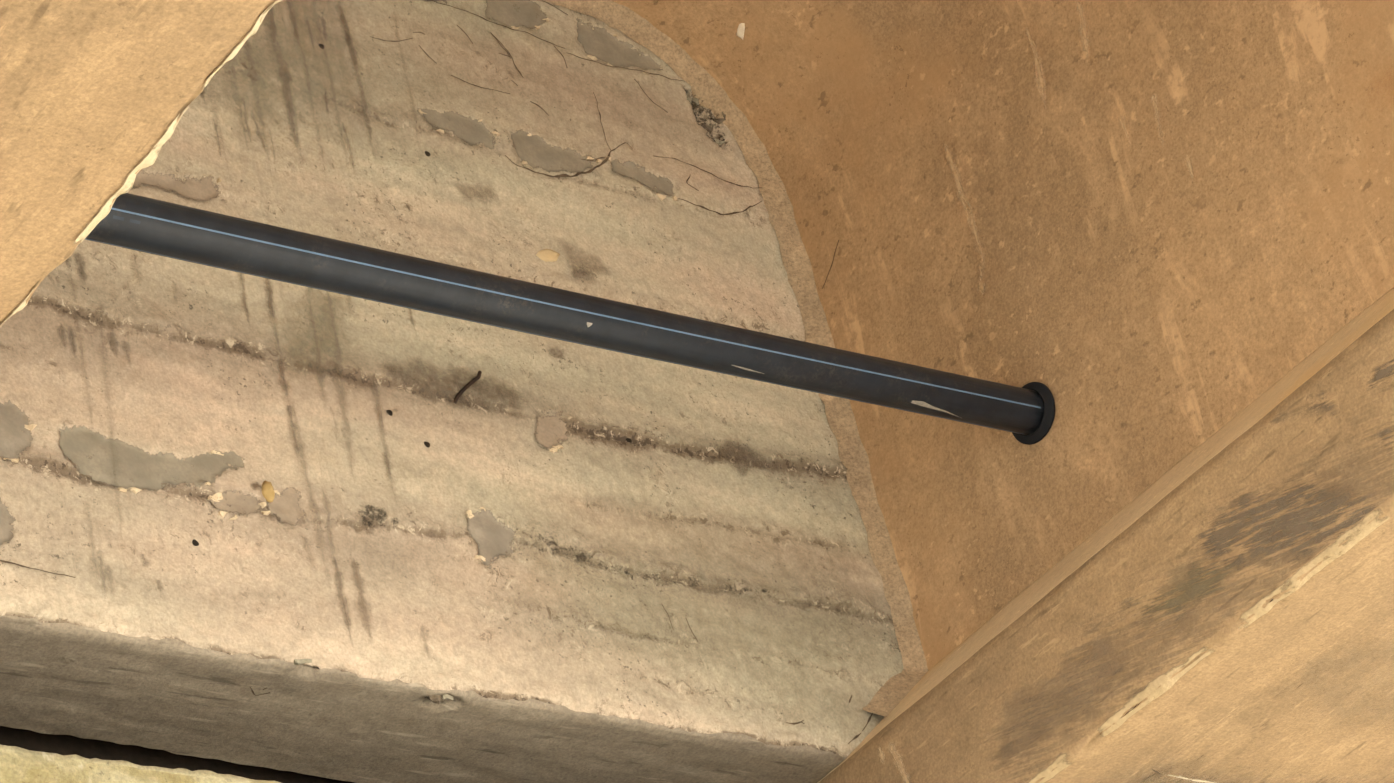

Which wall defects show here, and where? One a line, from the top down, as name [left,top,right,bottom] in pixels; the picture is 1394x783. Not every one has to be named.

spalling [203,0,283,88]
peeling [485,0,549,29]
peeling [577,19,663,75]
crack [369,0,762,215]
spalling [686,89,727,146]
peeling [418,109,677,201]
peeling [0,400,37,463]
peeling [58,425,306,526]
peeling [0,498,15,545]
peeling [465,507,515,569]
water stain [1142,486,1374,613]